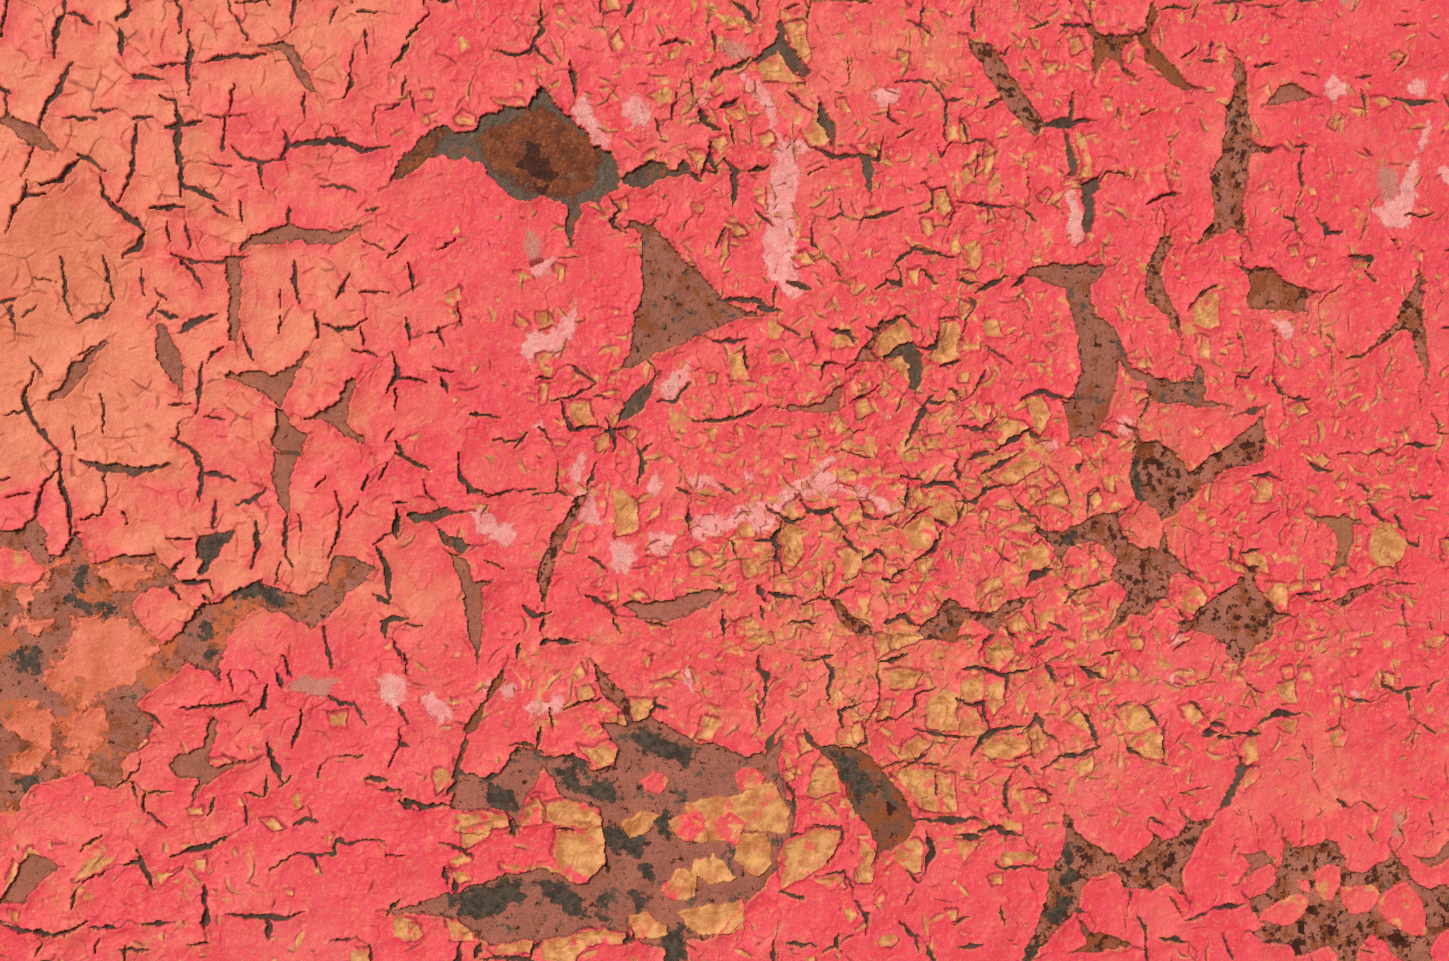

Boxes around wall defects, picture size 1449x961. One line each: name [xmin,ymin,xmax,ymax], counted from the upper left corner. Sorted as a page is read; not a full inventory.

corrosion [389,127,448,181]
corrosion [475,101,603,206]
peeling [390,85,787,369]
crack [654,31,773,248]
peeling [1070,4,1195,90]
peeling [1198,50,1273,244]
crack [0,0,657,674]
peeling [387,234,1320,961]
crack [677,79,1449,961]
crack [0,626,447,961]
crack [454,941,541,961]
peeling [1240,838,1449,961]